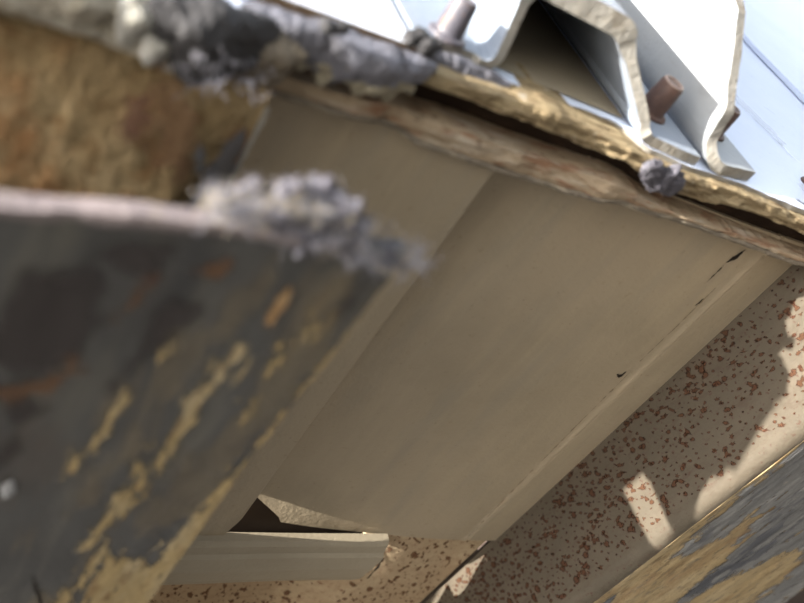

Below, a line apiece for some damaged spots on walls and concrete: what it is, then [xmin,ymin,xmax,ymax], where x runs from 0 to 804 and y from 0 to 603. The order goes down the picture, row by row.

rust [265,287,292,327]
peeling [56,343,287,603]
rust [150,580,301,603]
rust [337,268,804,603]
peeling [671,443,804,603]